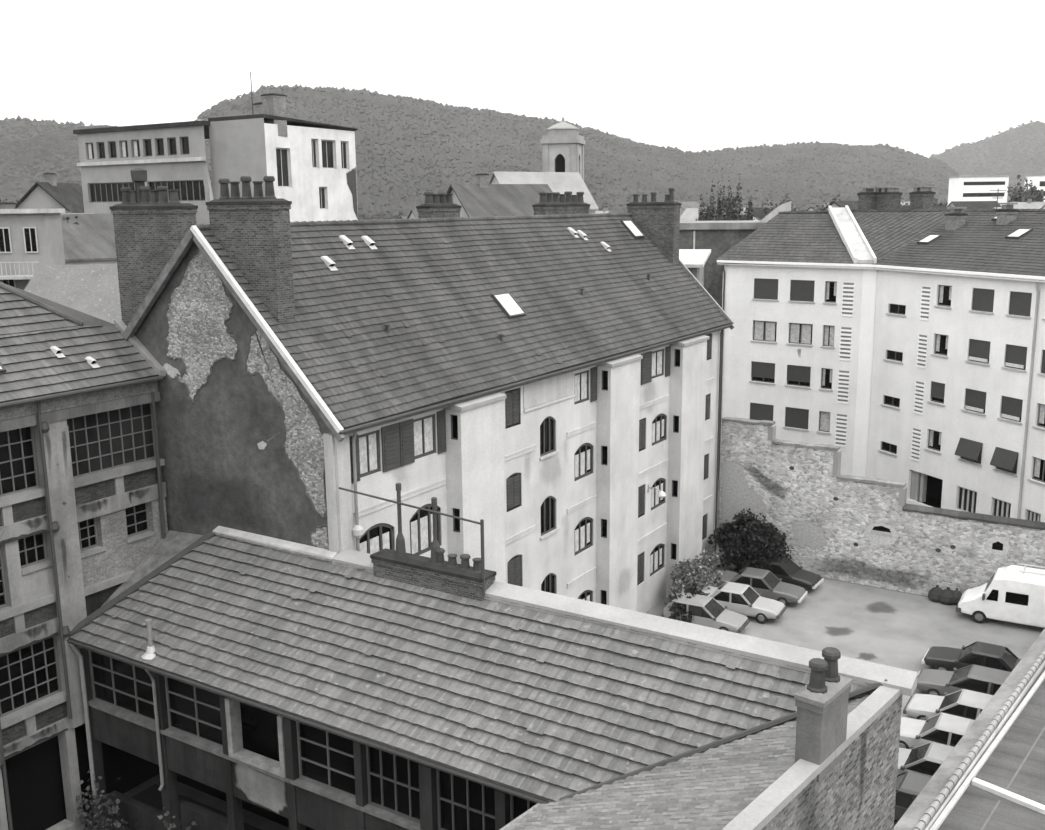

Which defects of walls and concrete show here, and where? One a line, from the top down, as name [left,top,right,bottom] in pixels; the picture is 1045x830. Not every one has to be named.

peeling [162,248,329,550]